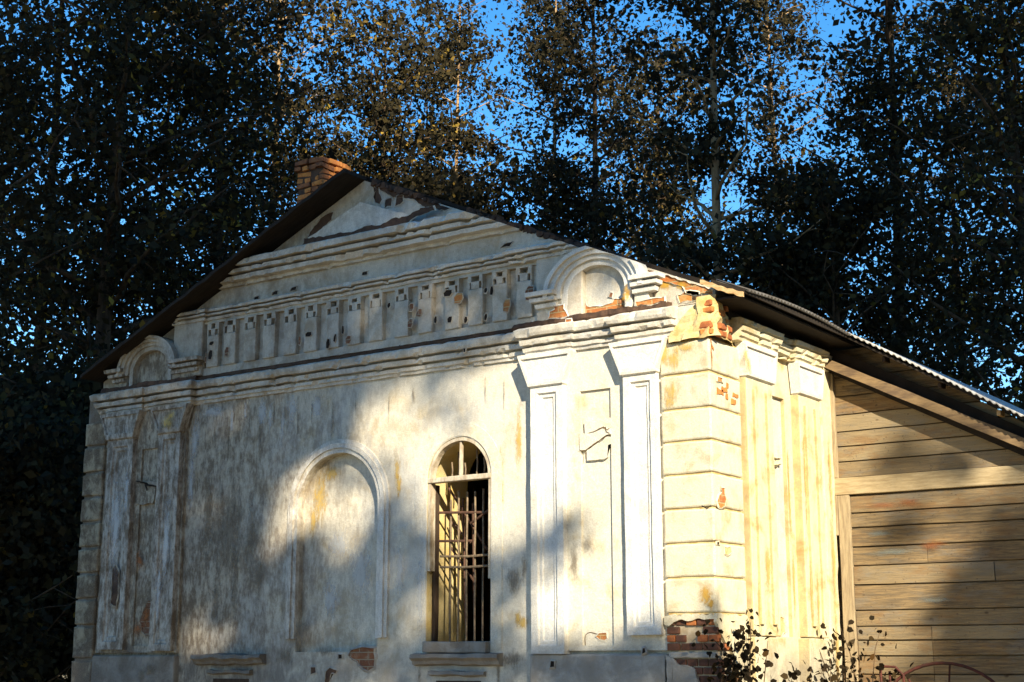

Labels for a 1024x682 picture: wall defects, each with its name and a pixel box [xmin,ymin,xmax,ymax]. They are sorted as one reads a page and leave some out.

spalling [302,183,452,245]
spalling [547,304,573,332]
spalling [585,269,733,347]
flaking render [716,376,739,405]
flaking render [579,418,611,461]
spalling [716,486,727,510]
spalling [310,644,378,682]
spalling [664,613,750,682]